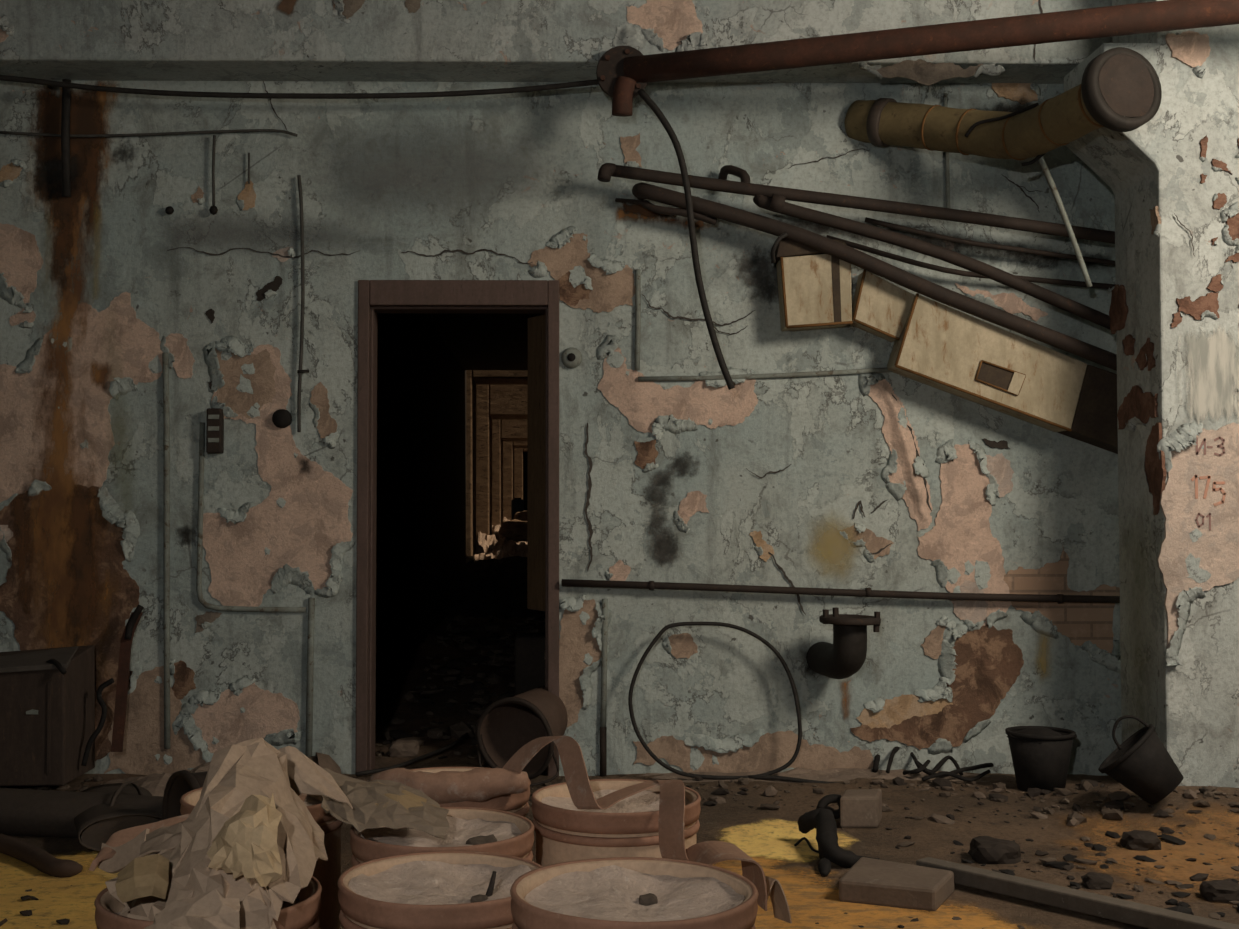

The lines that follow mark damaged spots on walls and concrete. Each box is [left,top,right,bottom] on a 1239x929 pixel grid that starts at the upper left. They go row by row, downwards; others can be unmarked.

flaking render [332,0,365,19]
flaking render [404,0,421,13]
peeling [626,0,713,52]
peeling [528,226,635,313]
corrosion [10,82,115,649]
peeling [596,335,758,473]
peeling [0,223,355,775]
peeling [1108,284,1239,666]
flaking render [633,373,1121,773]